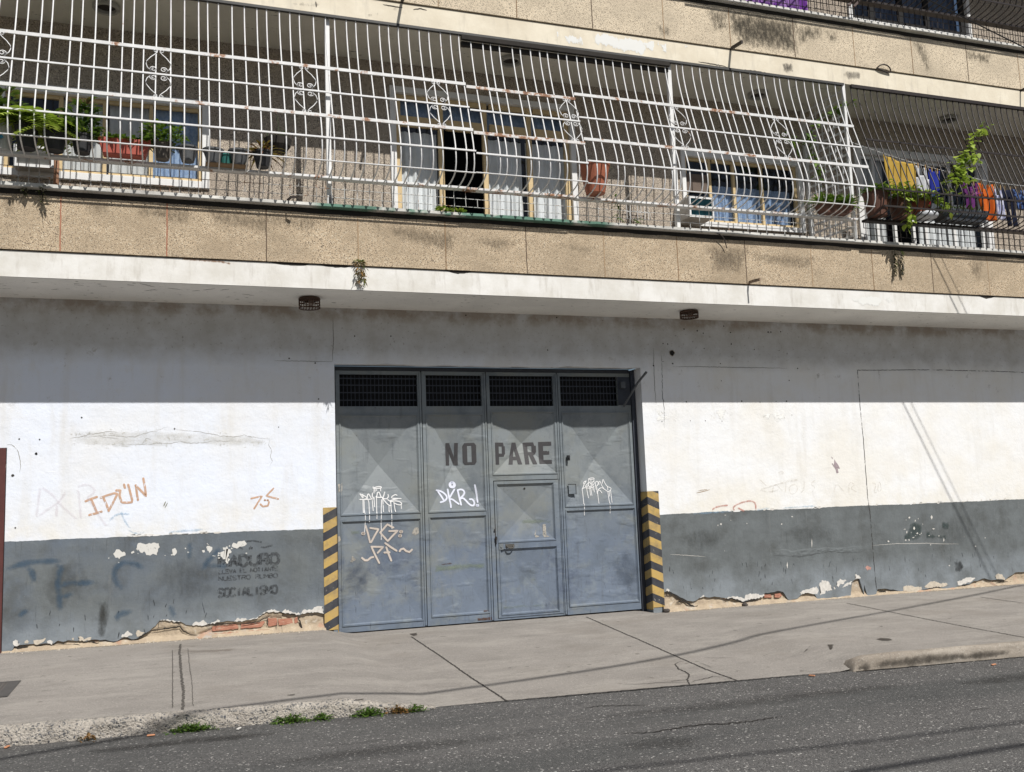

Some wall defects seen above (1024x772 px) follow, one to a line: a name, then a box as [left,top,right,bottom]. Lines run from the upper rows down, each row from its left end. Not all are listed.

peeling [557,32,667,55]
water stain [712,14,819,50]
peeling [108,530,247,564]
spalling [663,566,1024,613]
spalling [1,606,326,653]
crack [439,657,839,708]